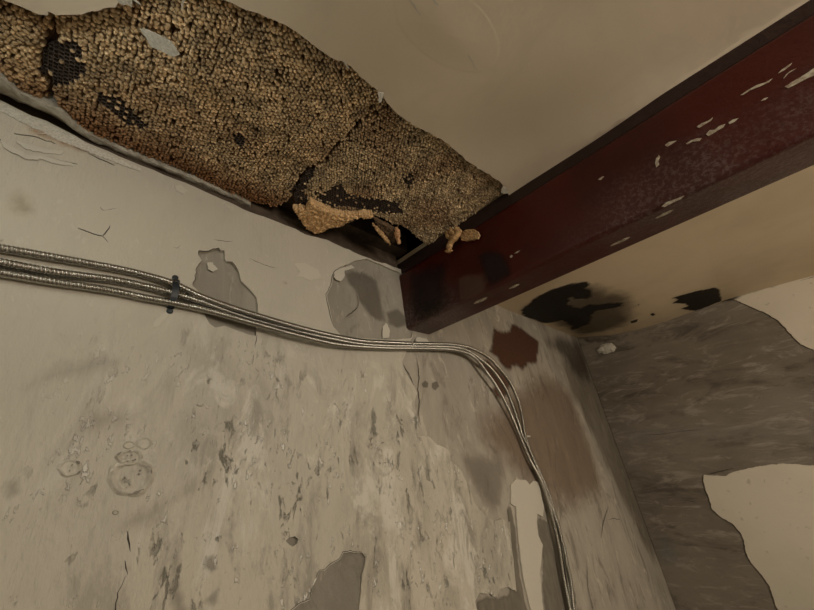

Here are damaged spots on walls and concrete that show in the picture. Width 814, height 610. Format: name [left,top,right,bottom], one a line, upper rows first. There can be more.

peeling [140,28,180,57]
peeling [0,103,141,172]
peeling [193,250,257,312]
peeling [204,313,256,336]
water stain [521,282,622,329]
peeling [327,260,814,610]
peeling [294,552,364,610]